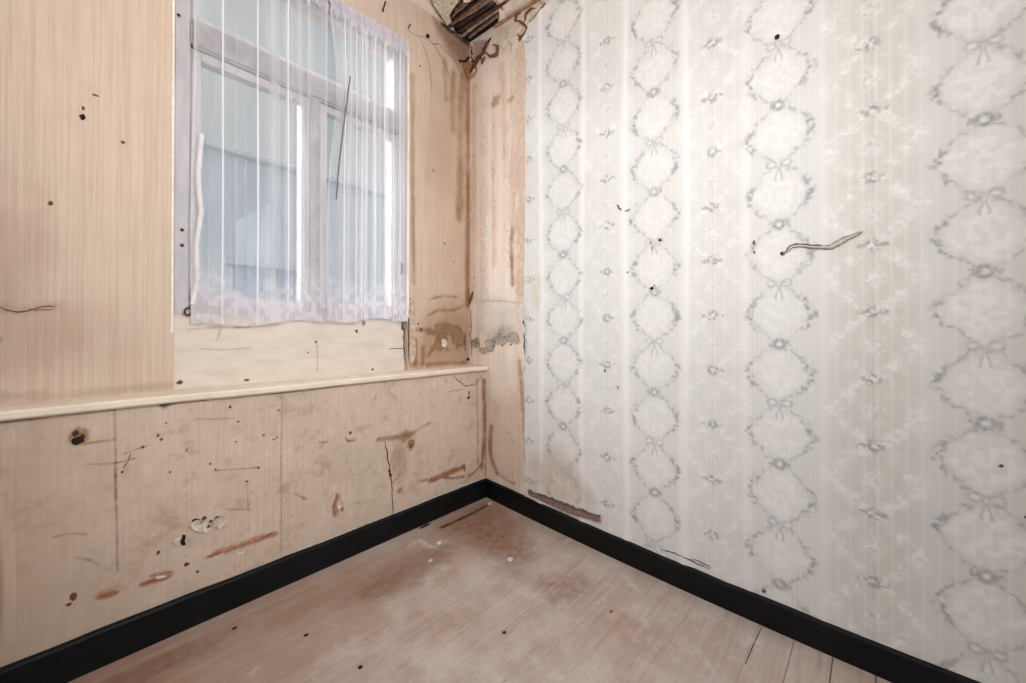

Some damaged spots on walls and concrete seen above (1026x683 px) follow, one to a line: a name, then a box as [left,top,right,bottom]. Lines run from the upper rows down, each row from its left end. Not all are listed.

damp [431,1,470,73]
spalling [446,2,477,79]
damp [457,163,486,231]
damp [503,106,525,295]
damp [417,322,518,361]
crack [294,442,484,553]
spalling [422,465,465,482]
spalling [208,532,277,558]
spalling [142,573,169,586]